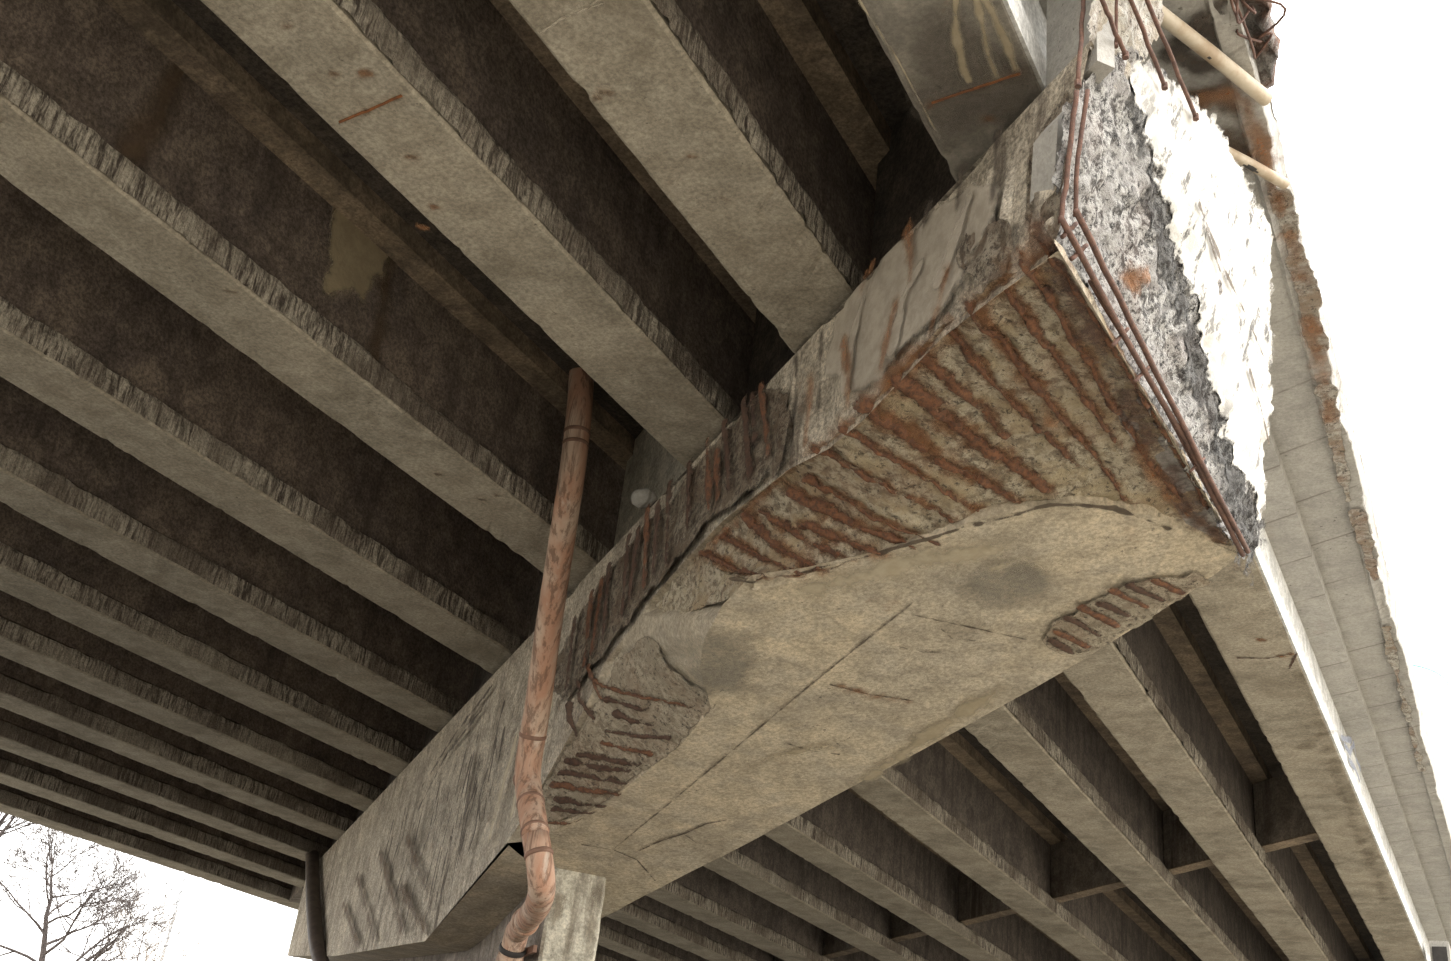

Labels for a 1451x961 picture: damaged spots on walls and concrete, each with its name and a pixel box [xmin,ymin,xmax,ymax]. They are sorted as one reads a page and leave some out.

water stain [117,65,183,164]
water stain [920,0,1034,201]
water stain [323,209,395,362]
spalling [542,0,1329,825]
spalling [1314,383,1379,581]
crack [582,603,1026,881]